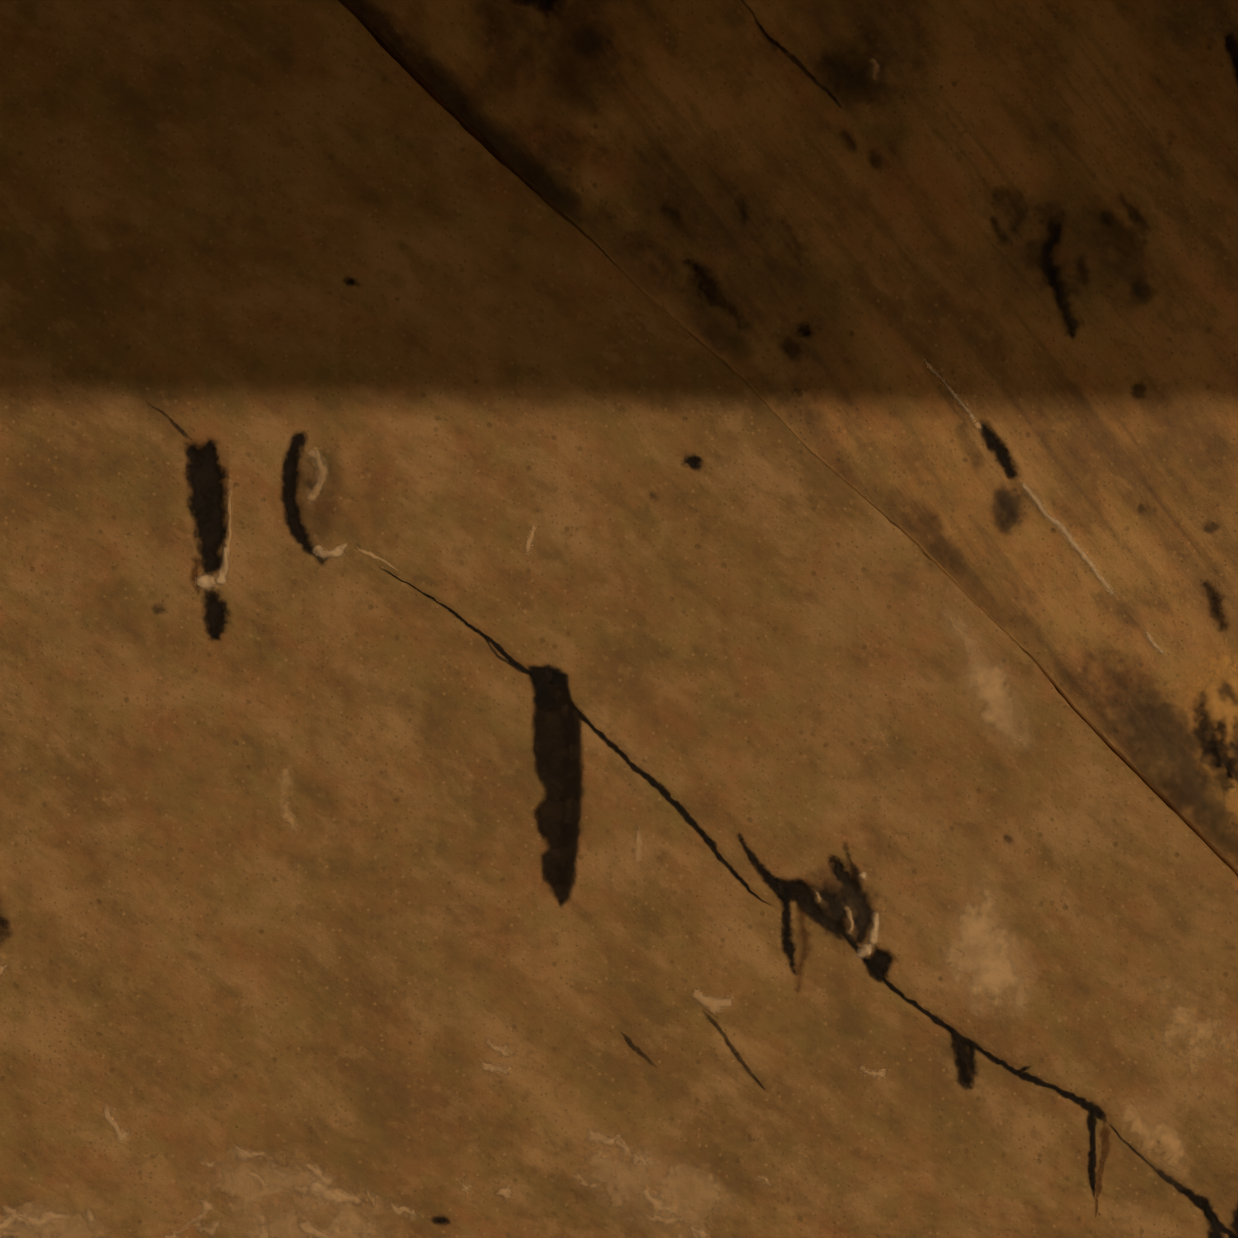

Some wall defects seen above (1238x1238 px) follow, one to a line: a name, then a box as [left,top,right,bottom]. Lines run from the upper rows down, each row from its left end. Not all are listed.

crack [741,0,877,163]
crack [156,408,187,436]
spalling [186,440,231,640]
crack [381,568,531,676]
crack [572,702,772,906]
peeling [1194,654,1238,833]
spalling [739,834,892,991]